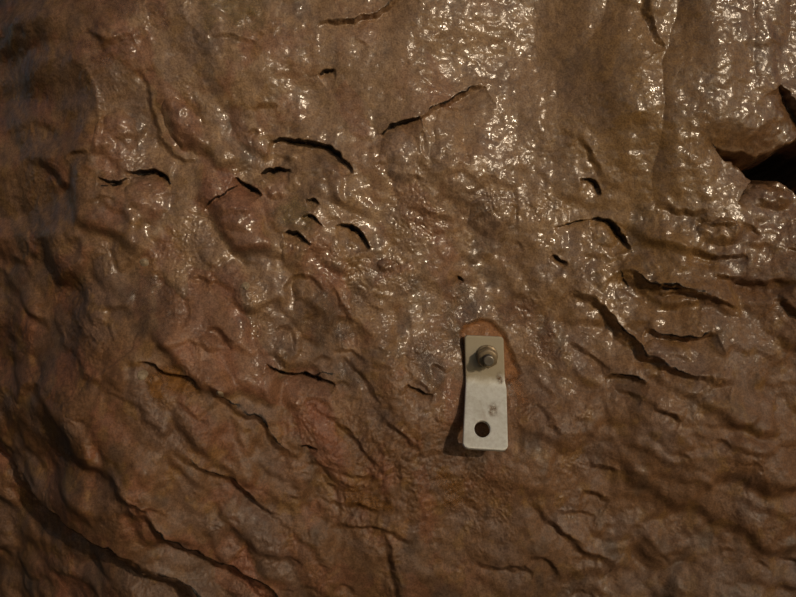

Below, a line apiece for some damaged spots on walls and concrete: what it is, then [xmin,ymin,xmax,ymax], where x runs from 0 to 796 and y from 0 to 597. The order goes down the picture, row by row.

crack [382,86,470,135]
crack [273,137,352,169]
crack [99,169,171,186]
crack [207,166,290,205]
crack [340,223,370,248]
crack [562,217,628,244]
crack [621,270,706,292]
crack [271,366,333,383]
crack [222,397,316,450]